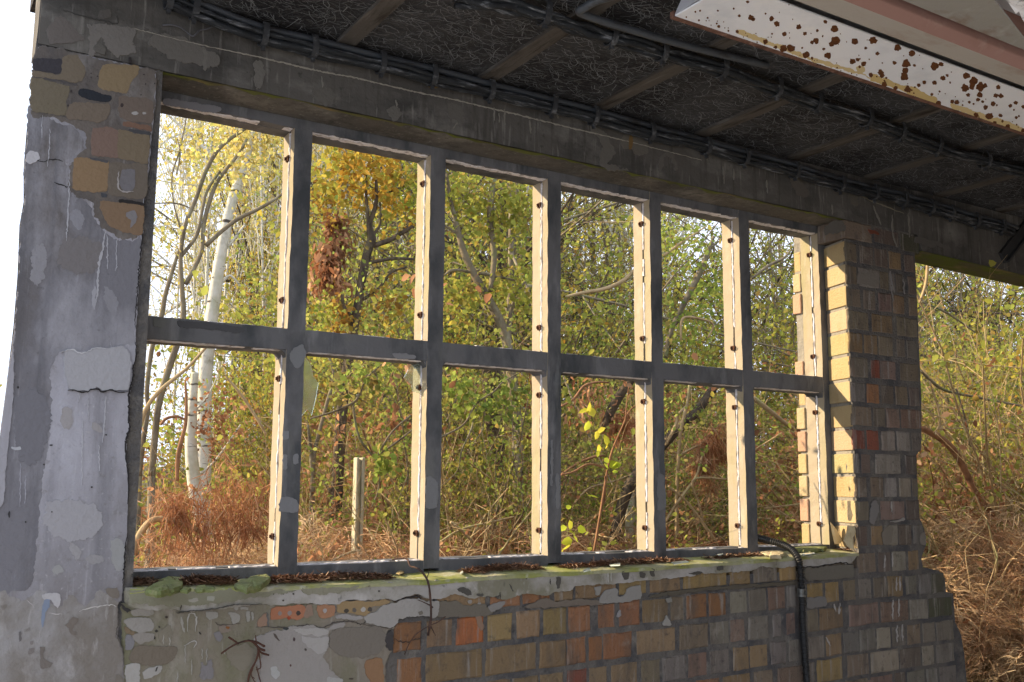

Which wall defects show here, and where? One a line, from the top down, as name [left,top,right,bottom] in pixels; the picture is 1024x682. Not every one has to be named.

spalling [25,151,40,164]
flaking render [30,23,221,236]
water stain [30,170,119,315]
flaking render [254,590,448,682]